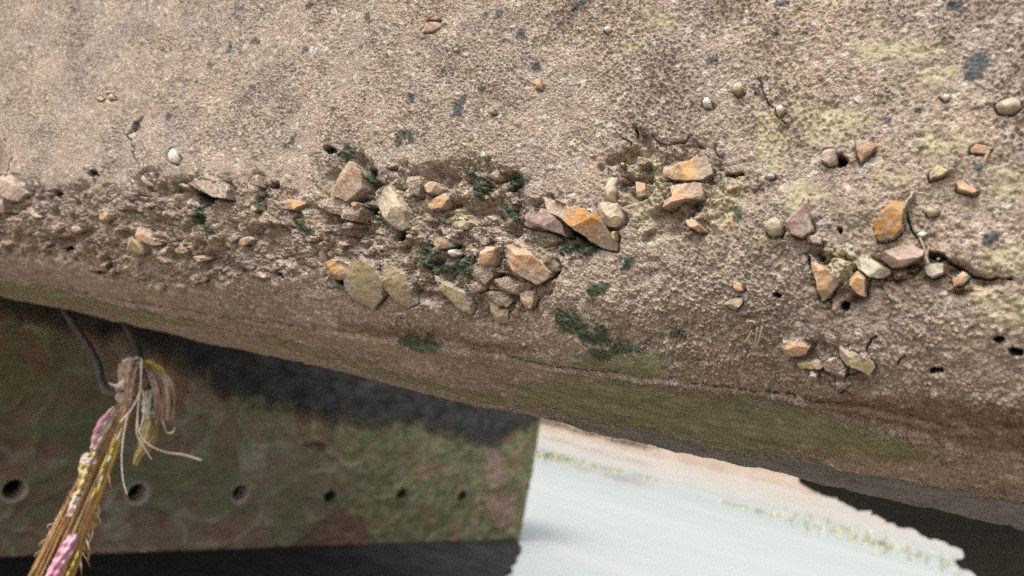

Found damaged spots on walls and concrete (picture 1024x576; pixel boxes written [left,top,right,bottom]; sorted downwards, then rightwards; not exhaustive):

spalling [0,133,781,326]
spalling [808,245,1016,317]
crack [908,216,1013,281]
spalling [781,337,879,392]